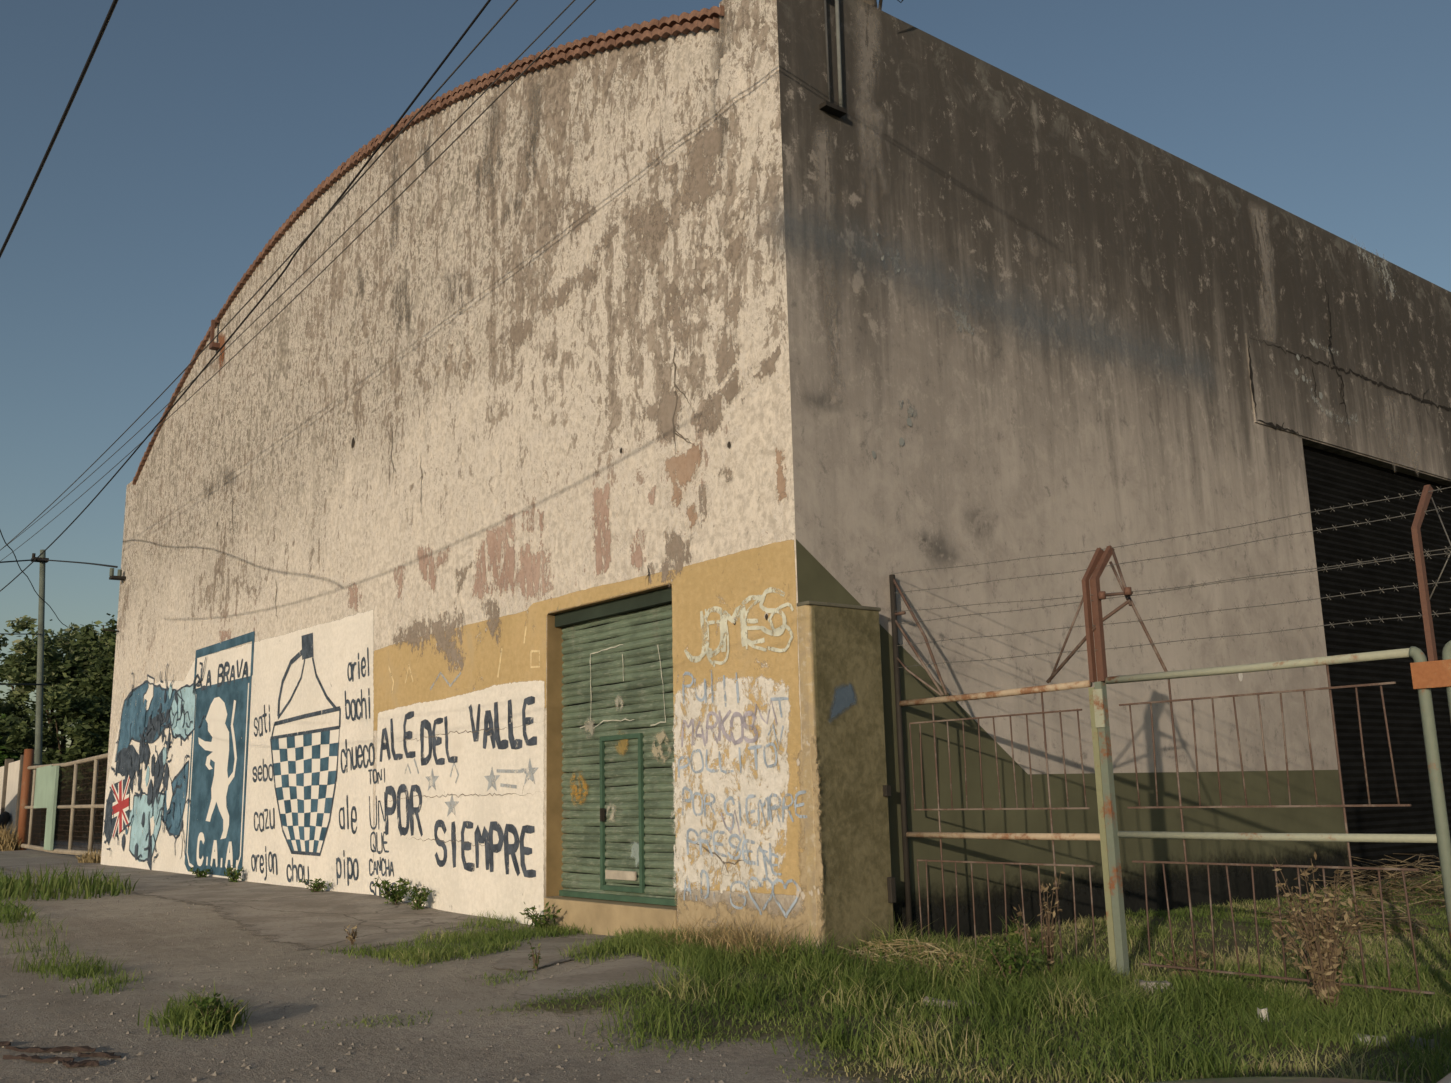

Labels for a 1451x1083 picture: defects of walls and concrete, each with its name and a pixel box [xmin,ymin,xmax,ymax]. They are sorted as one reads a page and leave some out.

flaking render [503,115,734,349]
flaking render [664,233,748,351]
damp [1252,208,1275,340]
crack [1248,269,1451,436]
peeling [393,509,554,672]
peeling [592,480,612,576]
flaking render [630,286,782,586]
flaking render [775,447,788,501]